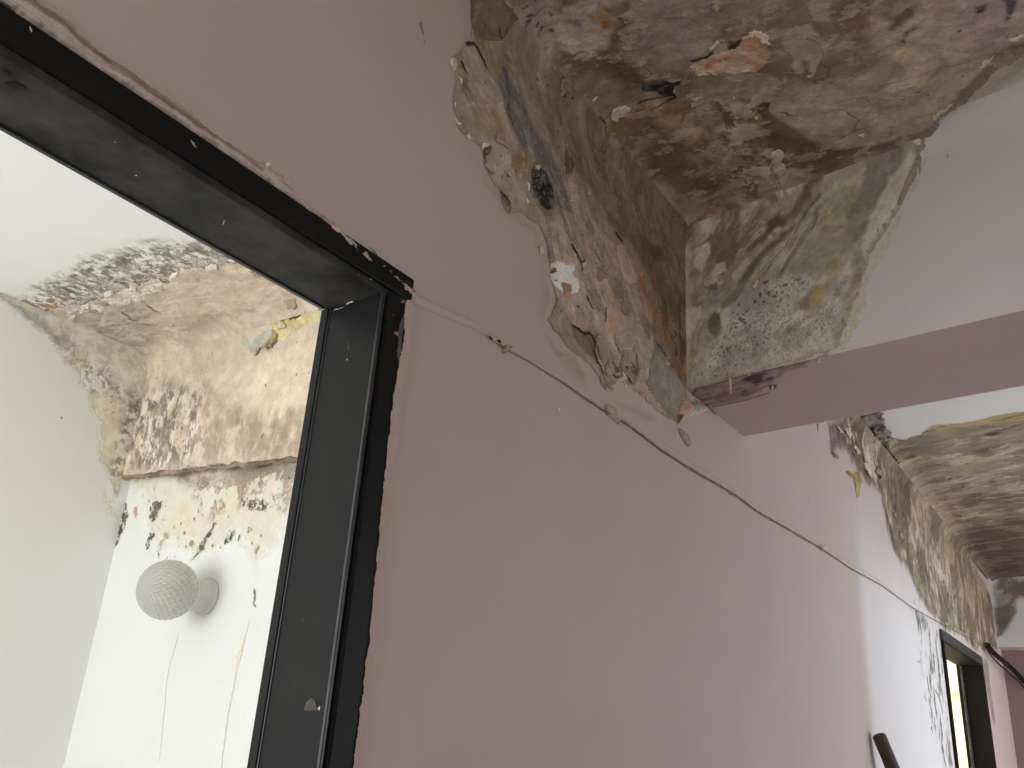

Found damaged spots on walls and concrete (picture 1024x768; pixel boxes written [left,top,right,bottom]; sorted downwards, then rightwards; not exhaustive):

water stain [0,242,323,558]
peeling [50,263,320,360]
spalling [121,456,298,481]
crack [412,292,978,644]
peeling [450,0,1024,447]
water stain [685,138,925,407]
water stain [928,412,1024,432]
water stain [996,577,1024,636]